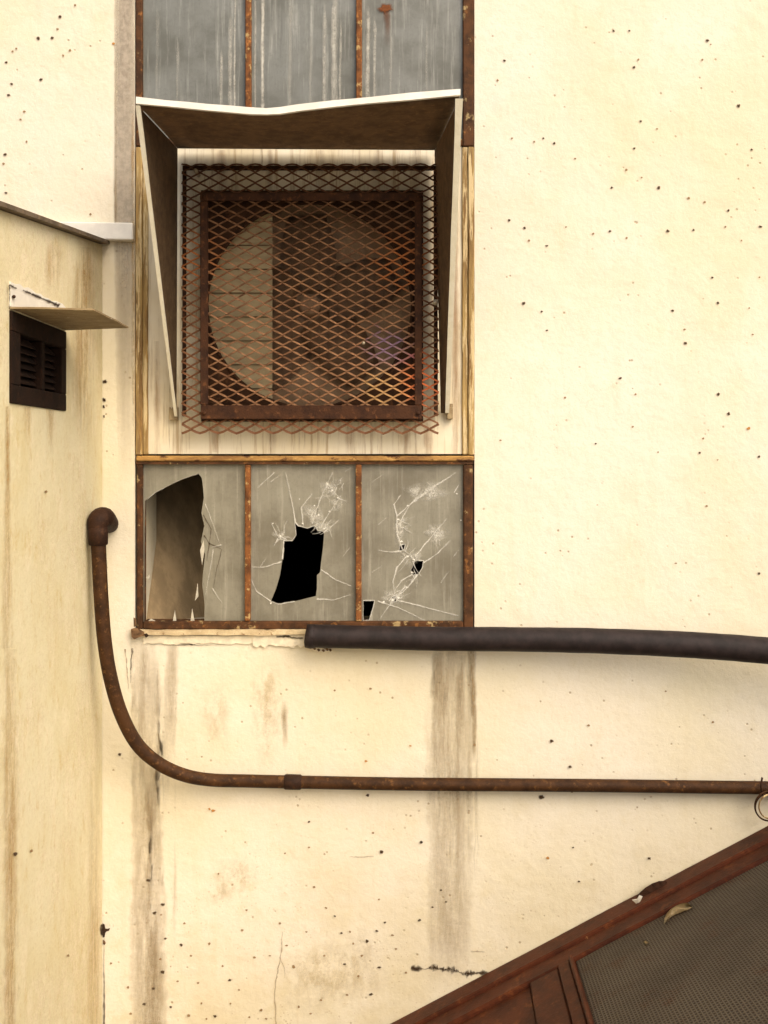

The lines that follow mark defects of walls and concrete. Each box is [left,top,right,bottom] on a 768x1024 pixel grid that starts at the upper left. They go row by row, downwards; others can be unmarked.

peeling [131,617,332,652]